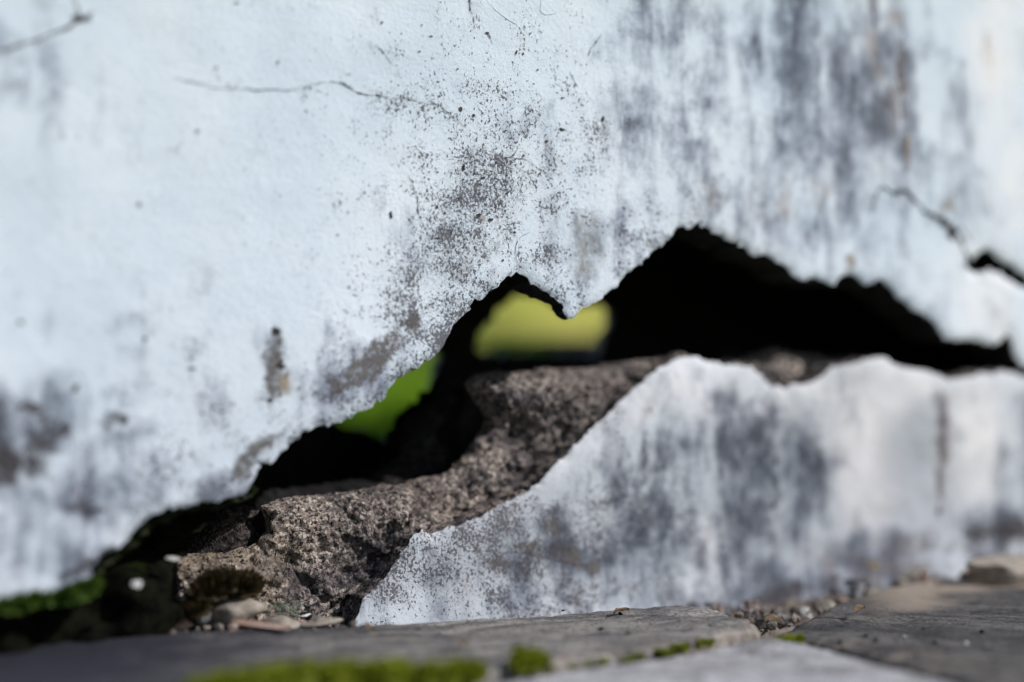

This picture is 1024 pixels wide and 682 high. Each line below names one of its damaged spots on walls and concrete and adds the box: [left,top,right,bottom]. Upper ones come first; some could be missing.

crack [175,78,547,174]
crack [871,186,973,271]
water stain [261,327,285,403]
water stain [326,311,420,395]
spalling [701,347,839,385]
spalling [171,356,665,627]
water stain [475,510,601,578]
water stain [937,404,948,515]
water stain [963,516,1024,543]
water stain [752,580,803,607]